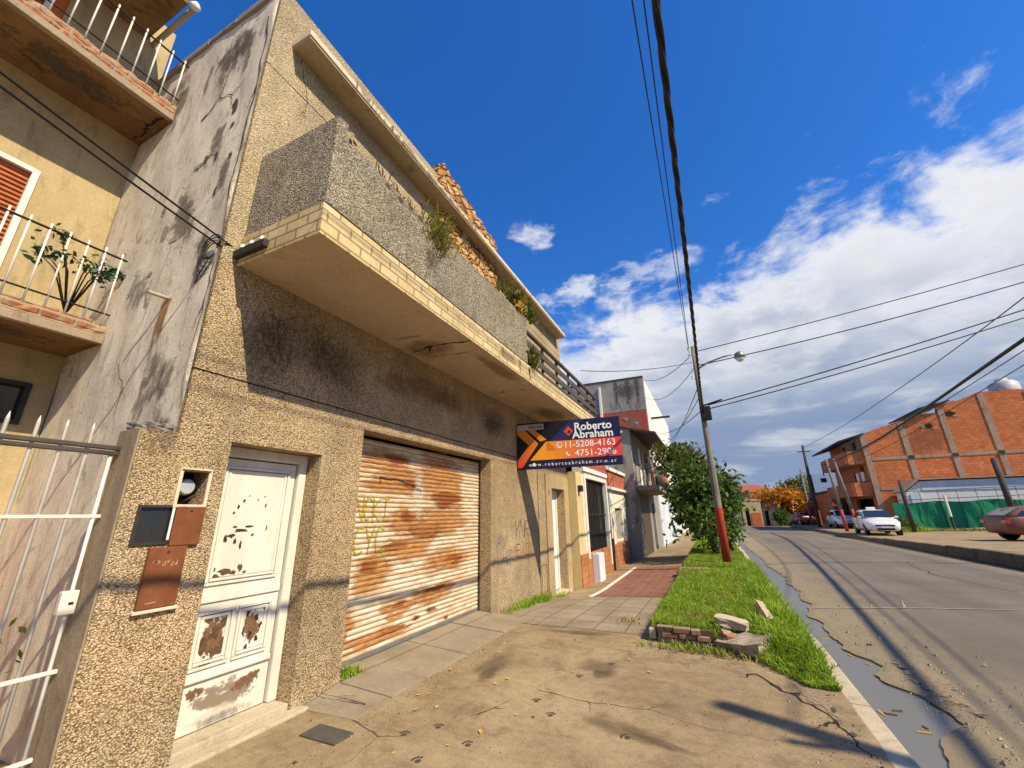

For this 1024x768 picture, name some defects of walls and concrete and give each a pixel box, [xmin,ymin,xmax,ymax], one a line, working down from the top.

damp [204,28,262,97]
crack [133,117,165,140]
damp [167,76,189,133]
crack [179,16,269,408]
damp [189,233,208,297]
damp [132,352,176,423]
peeling [223,495,267,549]
rust [342,448,469,657]
peeling [198,615,227,667]
peeling [241,607,265,648]
peeling [186,669,260,711]
crack [540,673,872,758]